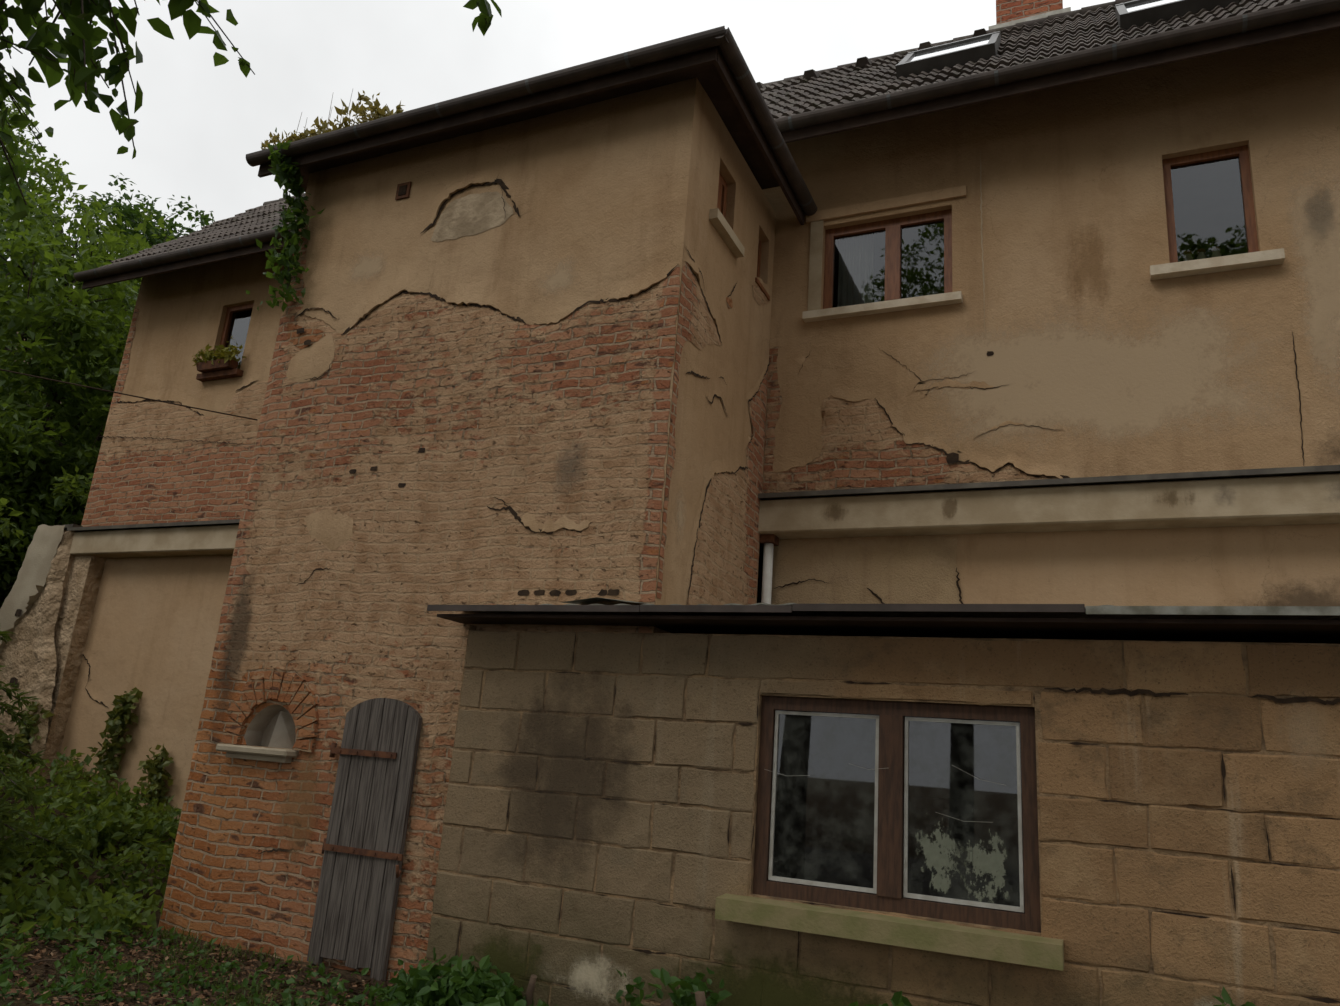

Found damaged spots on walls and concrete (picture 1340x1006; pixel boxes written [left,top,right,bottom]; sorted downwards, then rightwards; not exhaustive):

crack [879,349,1068,440]
crack [487,497,592,534]
spalling [682,343,1086,605]
peeling [0,524,65,653]
spalling [81,200,770,984]